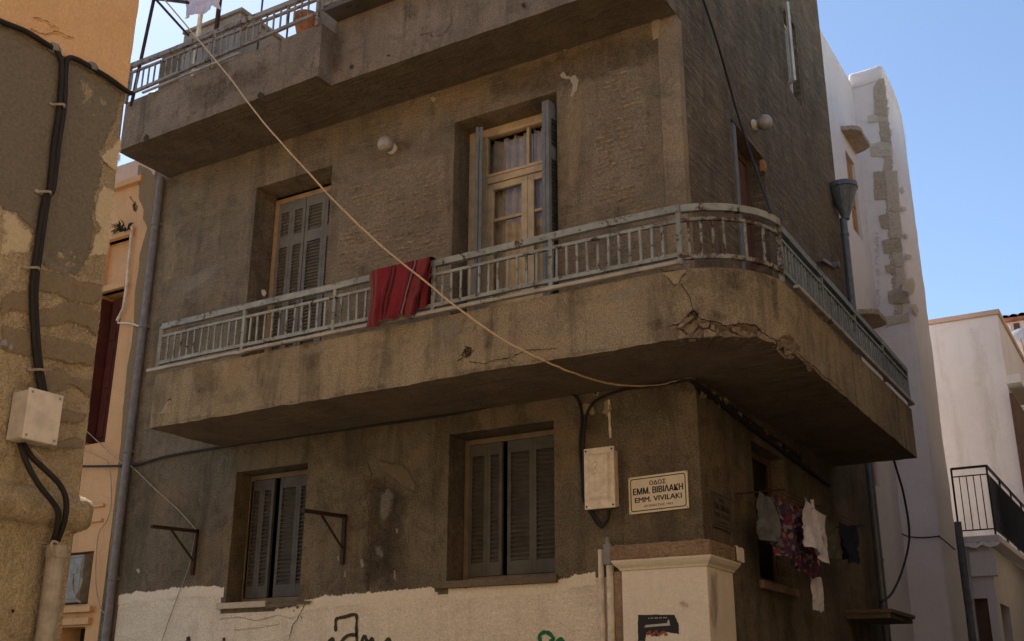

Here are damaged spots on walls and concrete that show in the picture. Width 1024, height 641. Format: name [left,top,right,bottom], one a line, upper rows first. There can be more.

peeling [560,72,579,97]
flaking render [102,139,122,172]
flaking render [0,211,32,256]
flaking render [89,186,114,256]
flaking render [0,269,102,397]
spalling [673,310,761,343]
crack [659,269,843,392]
crack [469,347,557,366]
flaking render [60,408,86,423]